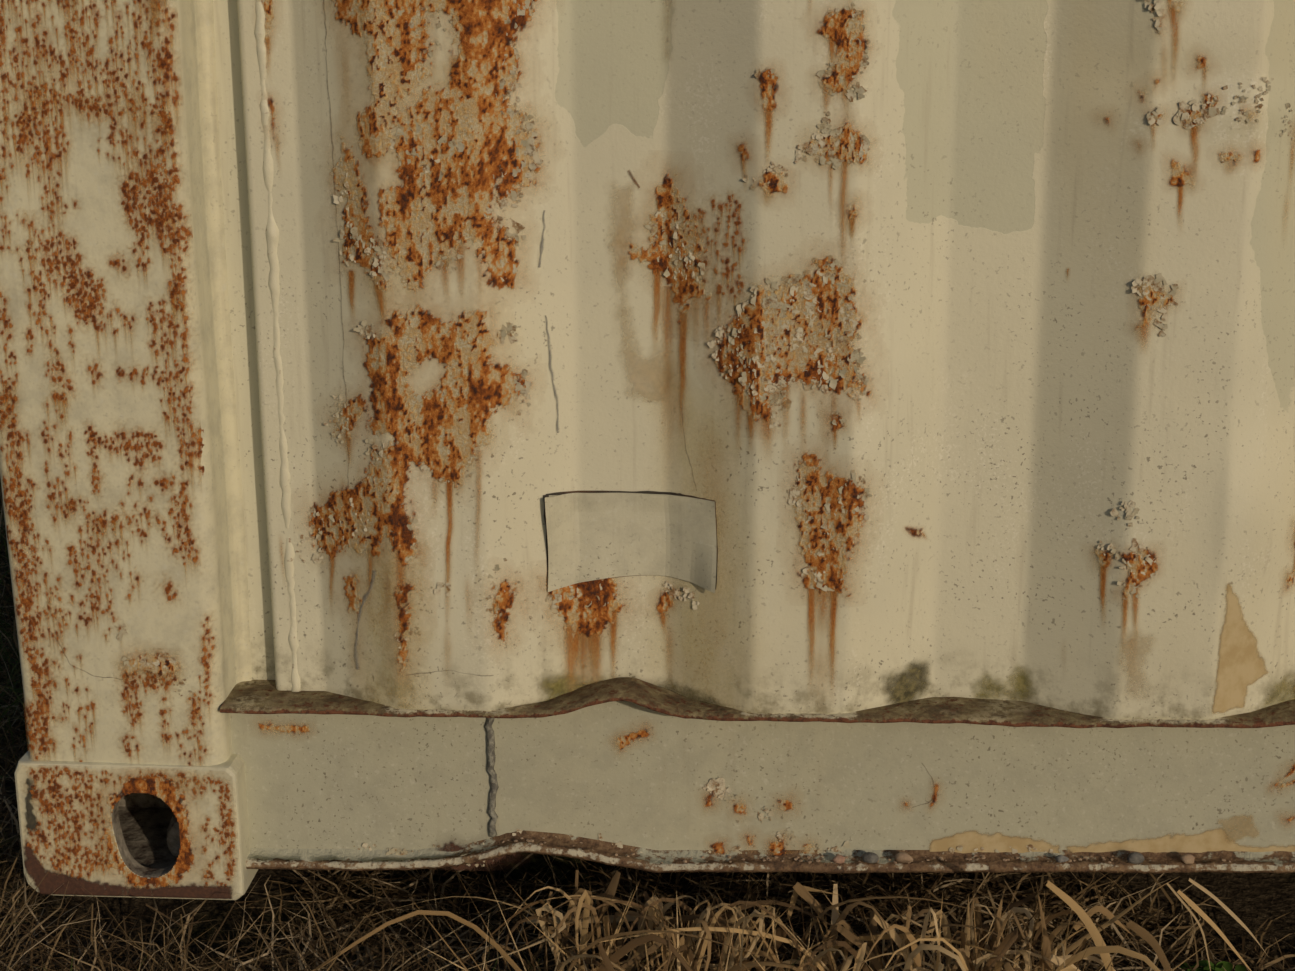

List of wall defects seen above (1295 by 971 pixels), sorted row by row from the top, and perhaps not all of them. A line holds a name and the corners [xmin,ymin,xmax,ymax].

rust [816,3,871,105]
rust [737,67,788,194]
rust [1170,94,1218,215]
rust [296,0,543,672]
rust [628,173,871,442]
rust [1131,273,1179,341]
rust [545,578,626,678]
rust [788,453,872,670]
rust [1095,500,1158,629]
peeling [1212,584,1268,713]
rust [102,773,196,889]
peeling [929,828,1295,854]